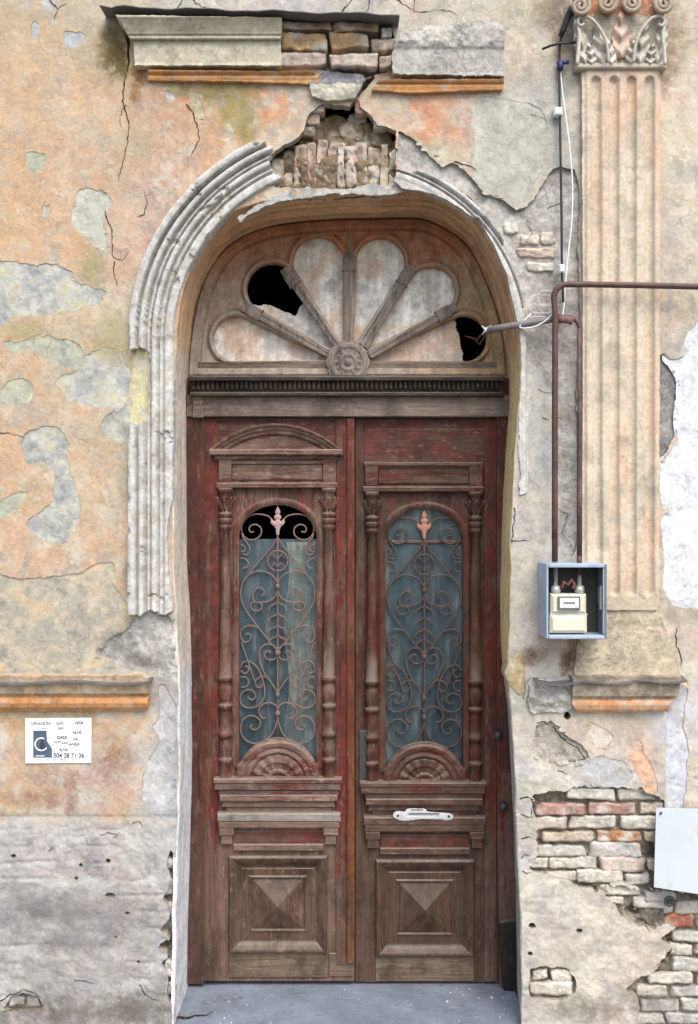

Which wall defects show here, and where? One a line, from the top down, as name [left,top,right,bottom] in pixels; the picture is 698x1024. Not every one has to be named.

crack [118,38,130,177]
crack [186,104,200,155]
peeling [71,188,112,255]
peeling [0,260,106,329]
flaking render [270,21,579,557]
peeling [0,334,151,460]
peeling [22,426,82,544]
peeling [659,321,698,609]
spalling [528,682,698,1024]